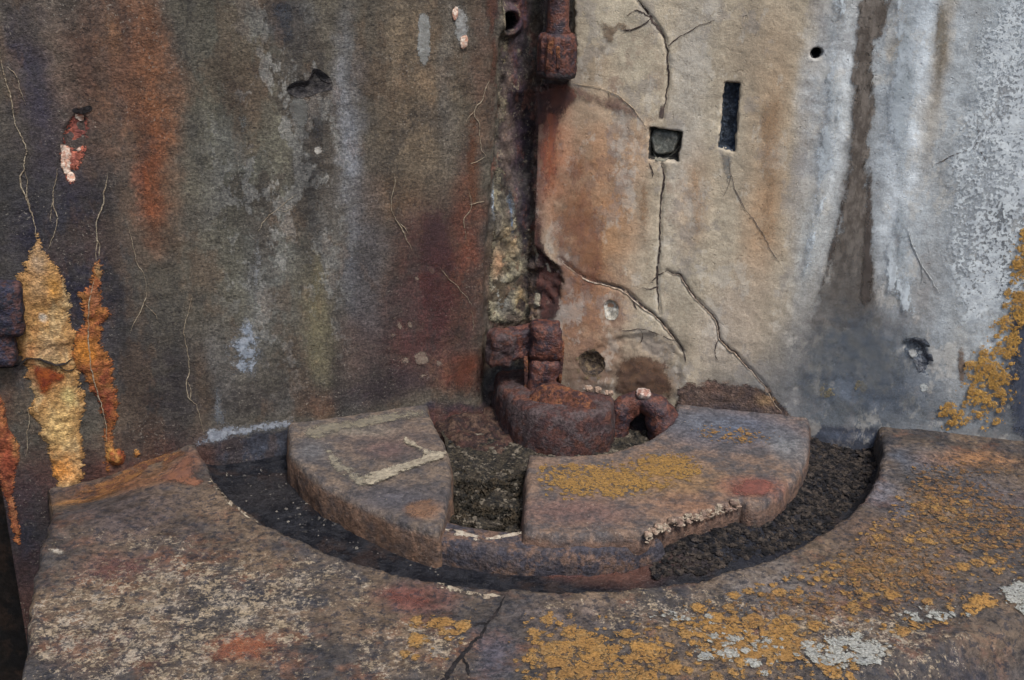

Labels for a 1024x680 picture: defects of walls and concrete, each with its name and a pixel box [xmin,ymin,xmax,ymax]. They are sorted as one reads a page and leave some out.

spalling [287,68,333,98]
crack [573,1,714,128]
spalling [59,106,92,184]
water stain [815,0,920,315]
crack [531,157,782,412]
spalling [902,337,933,391]
crack [440,596,505,680]